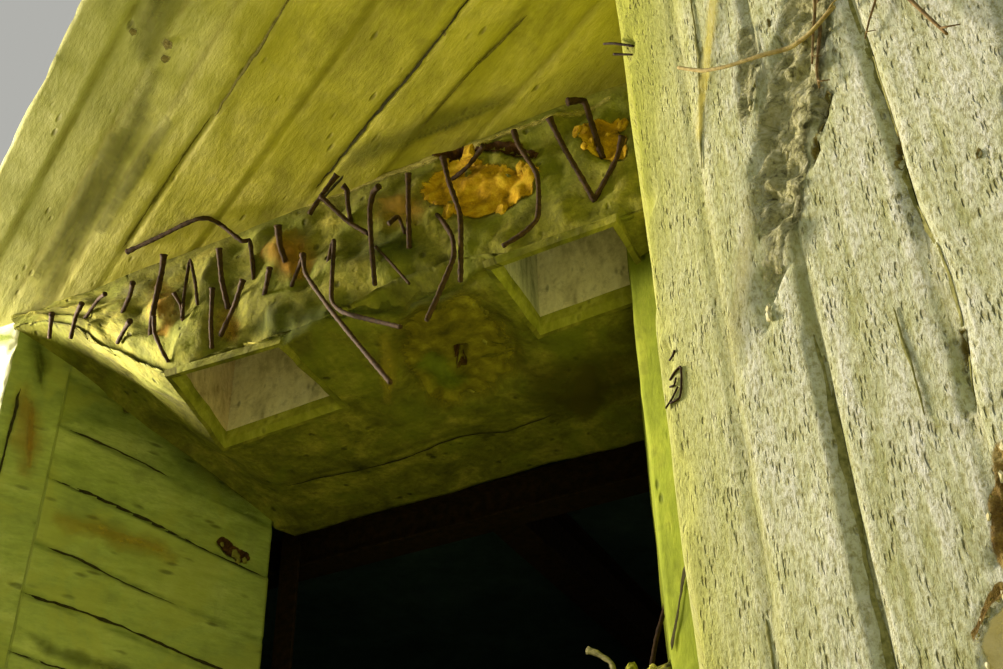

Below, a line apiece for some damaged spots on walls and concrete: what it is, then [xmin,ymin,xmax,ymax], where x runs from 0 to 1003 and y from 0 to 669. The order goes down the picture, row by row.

spalling [69,292,107,339]
water stain [38,99,165,304]
corrosion [269,239,302,272]
spalling [125,129,542,408]
spalling [546,97,629,202]
spalling [736,0,832,322]
crack [848,0,964,327]
crack [893,307,925,415]
crack [968,355,977,406]
crack [813,334,896,669]
spalling [986,439,1003,569]
peeling [971,582,1003,669]